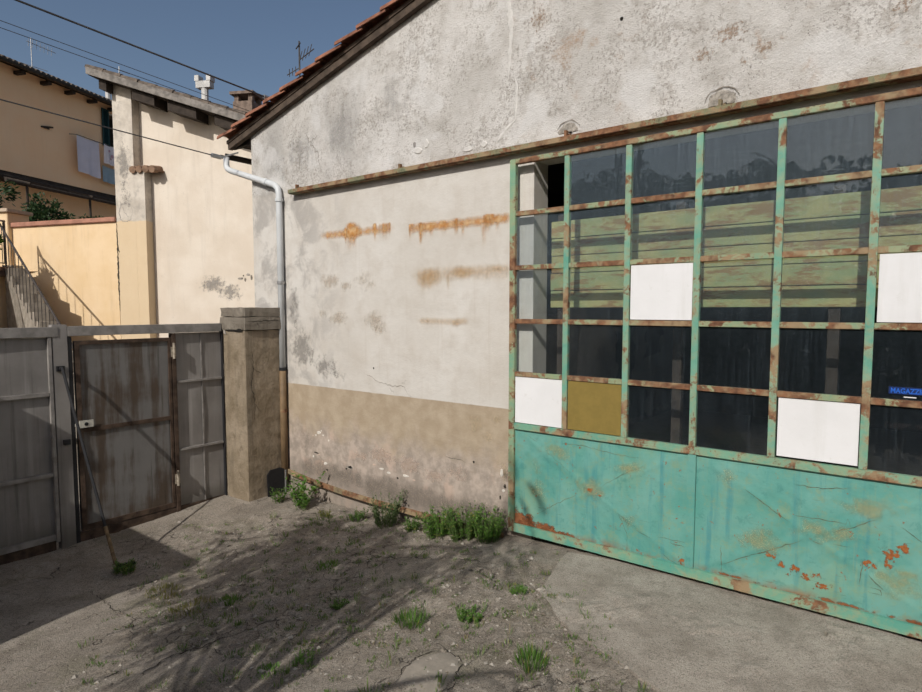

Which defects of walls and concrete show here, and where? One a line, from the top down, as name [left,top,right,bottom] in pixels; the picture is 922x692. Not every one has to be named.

corrosion [326,223,390,240]
corrosion [409,214,508,235]
corrosion [515,509,575,538]
corrosion [860,543,909,569]
corrosion [765,551,859,609]